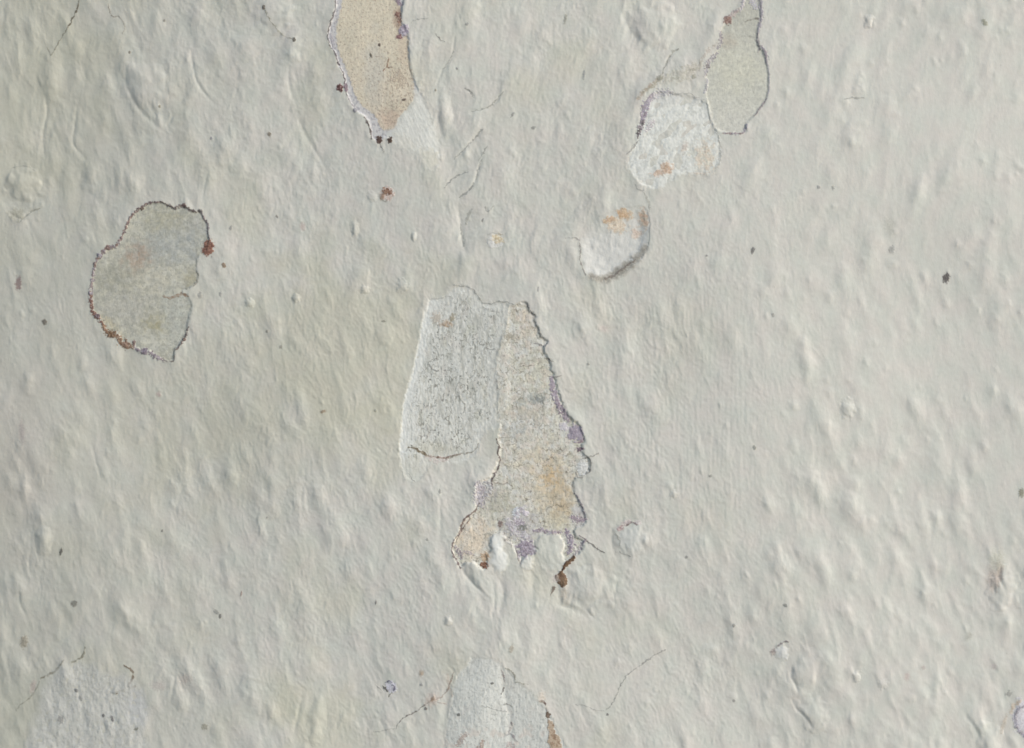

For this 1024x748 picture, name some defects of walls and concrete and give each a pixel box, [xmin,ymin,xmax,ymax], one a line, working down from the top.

peeling [327,0,445,173]
peeling [698,0,771,136]
peeling [87,200,216,363]
peeling [397,279,599,578]
peeling [439,655,569,748]